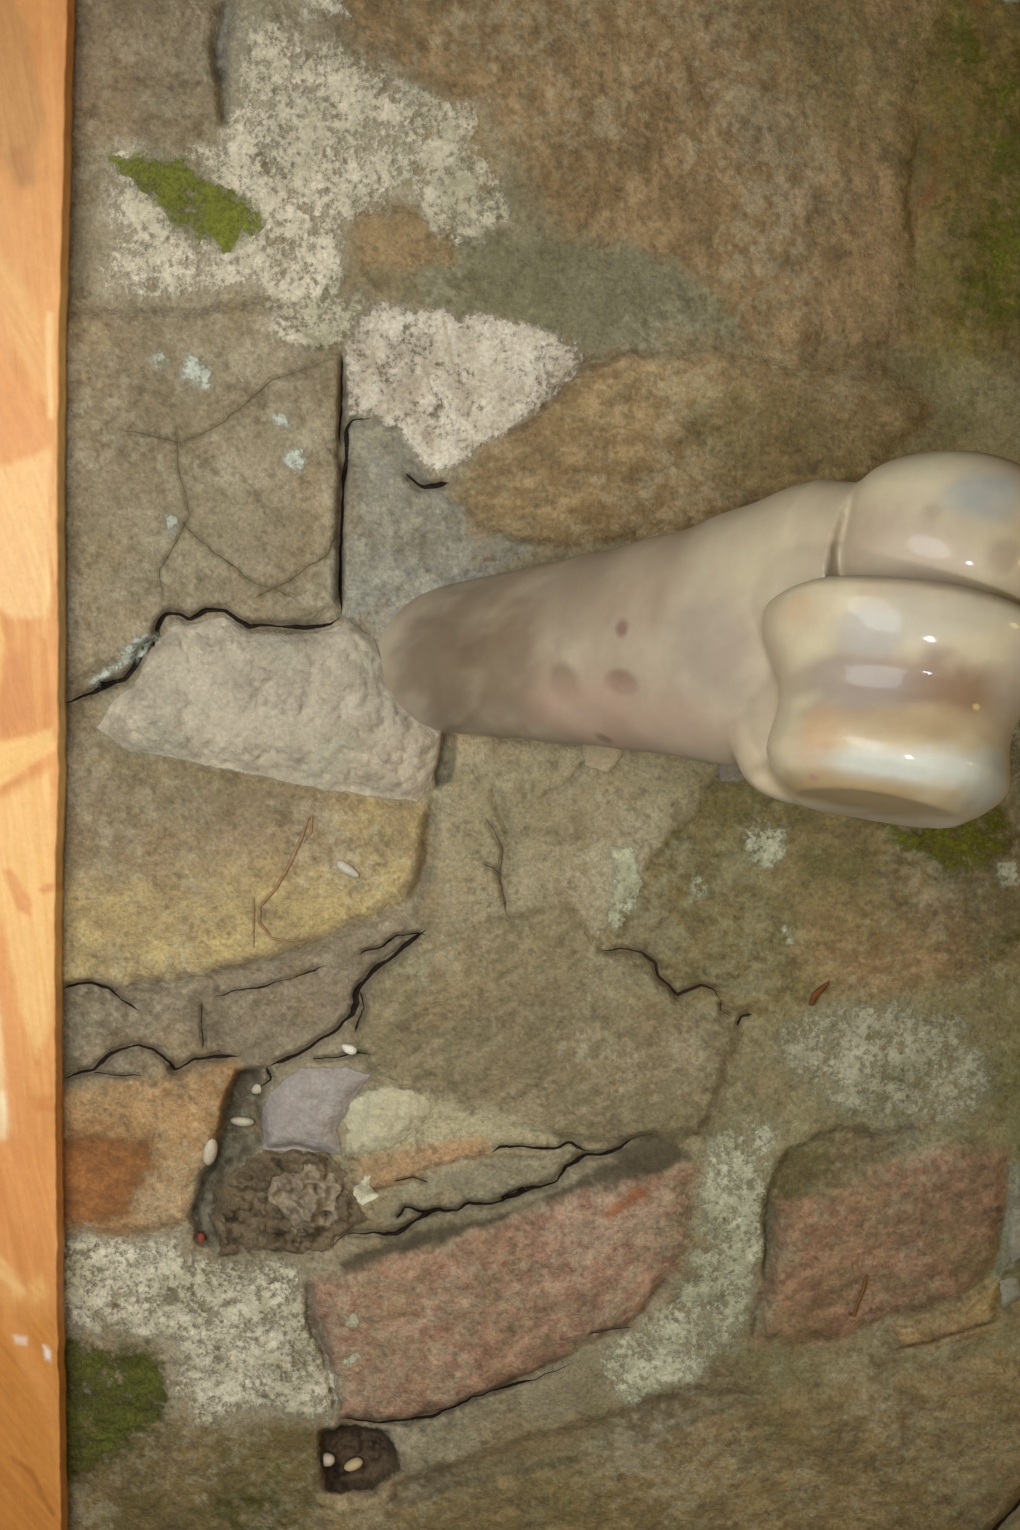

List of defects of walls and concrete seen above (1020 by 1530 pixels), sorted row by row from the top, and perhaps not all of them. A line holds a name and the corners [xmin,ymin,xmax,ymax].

crack [66,358,460,703]
crack [63,930,426,1096]
crack [602,948,752,1026]
crack [334,1134,648,1245]
crack [992,1500,1020,1530]